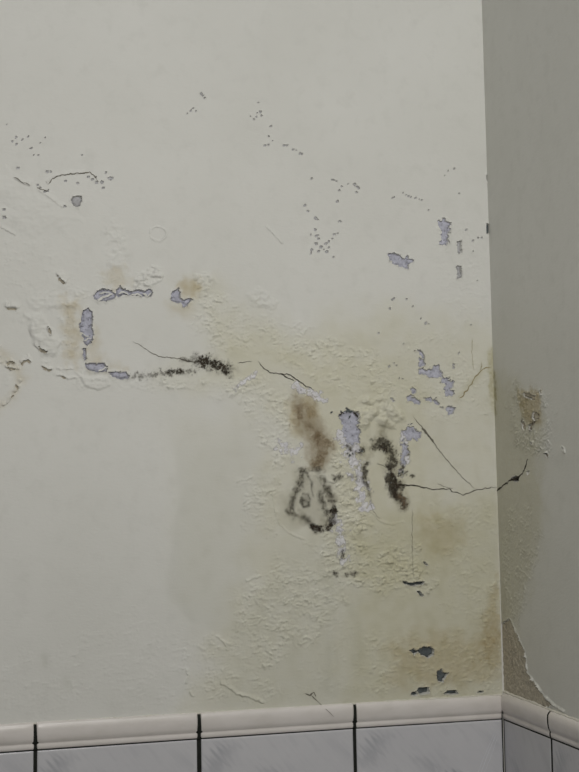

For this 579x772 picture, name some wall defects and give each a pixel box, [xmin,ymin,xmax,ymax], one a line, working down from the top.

spalling [386,249,416,271]
spalling [434,215,489,281]
crack [134,342,200,364]
peeling [40,268,302,488]
crack [239,361,313,390]
crack [460,341,490,398]
peeling [387,318,566,483]
crack [398,418,528,496]
water stain [291,429,414,575]
peeling [221,406,441,703]
spalling [406,643,463,698]
spalling [473,573,553,709]